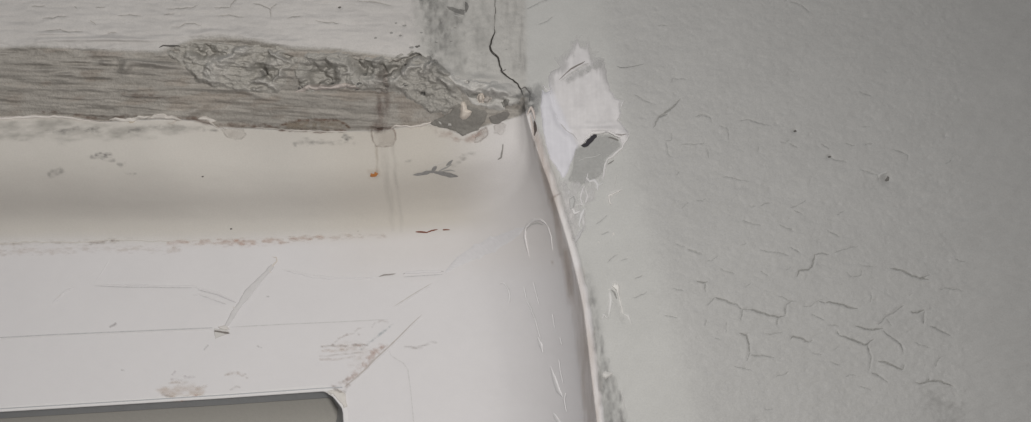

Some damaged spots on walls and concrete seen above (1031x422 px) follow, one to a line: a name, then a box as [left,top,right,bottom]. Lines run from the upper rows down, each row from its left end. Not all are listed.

spalling [159,20,537,141]
spalling [447,2,469,28]
crack [489,0,530,102]
crack [635,78,797,181]
crack [673,200,961,390]